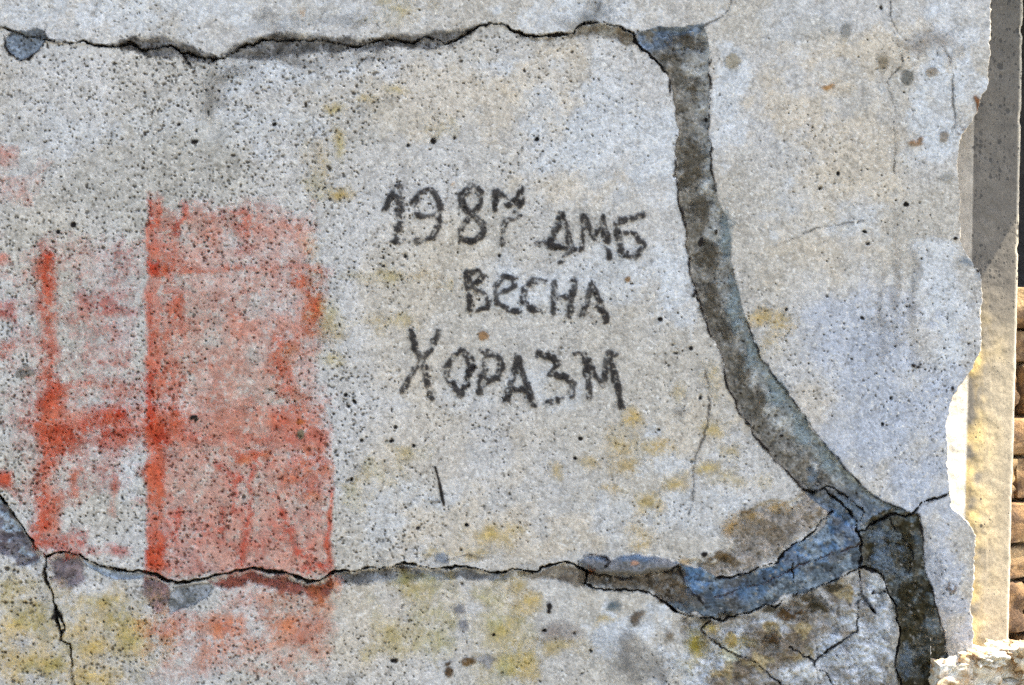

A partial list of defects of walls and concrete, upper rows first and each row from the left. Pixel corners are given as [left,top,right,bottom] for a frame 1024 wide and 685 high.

crack [3,27,55,62]
crack [64,40,224,71]
crack [231,21,949,685]
crack [0,494,682,665]